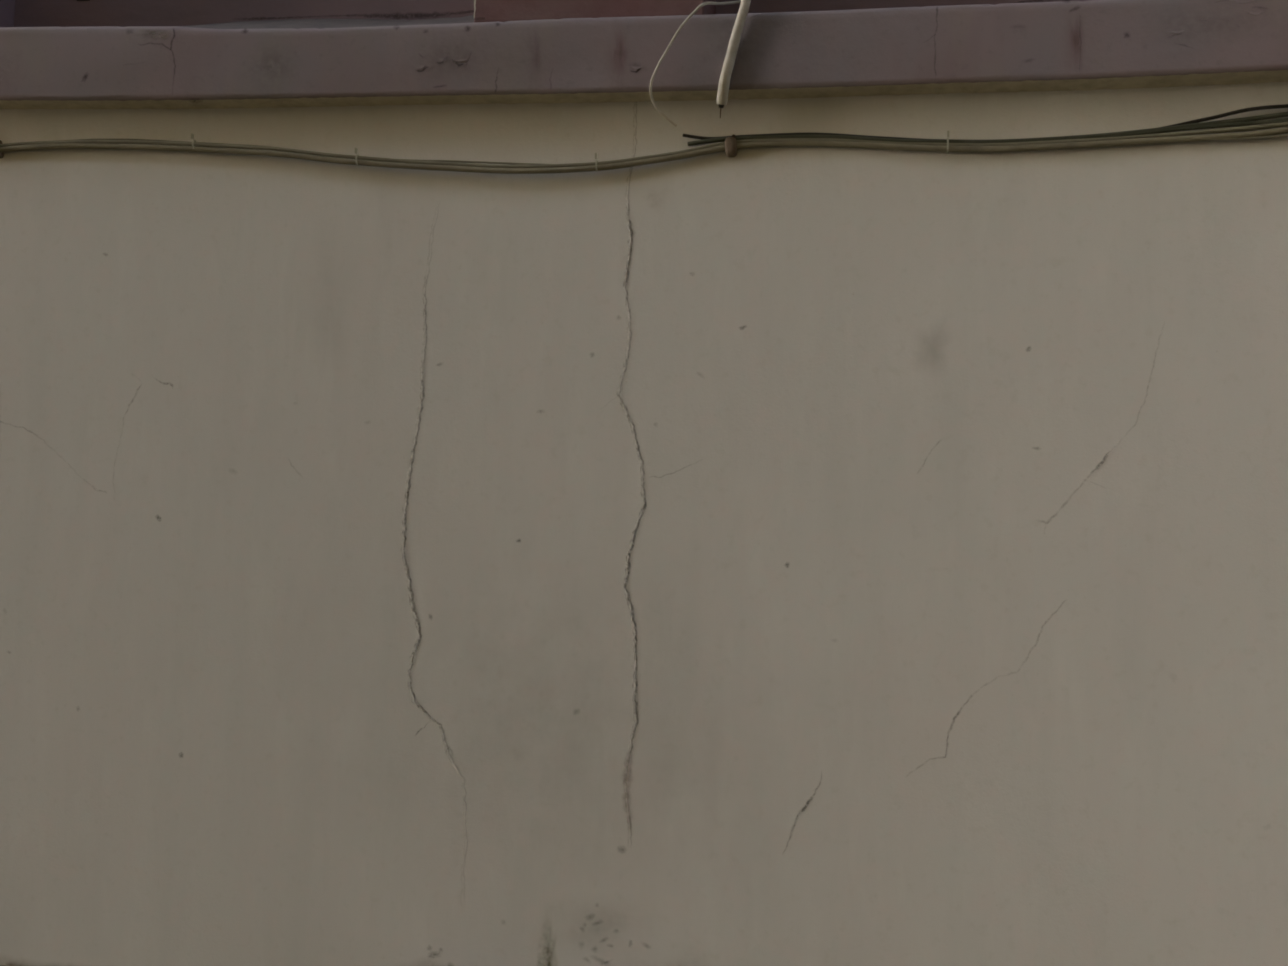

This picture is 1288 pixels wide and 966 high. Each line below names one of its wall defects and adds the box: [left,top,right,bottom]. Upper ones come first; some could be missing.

crack [404,372,445,739]
crack [620,225,646,740]